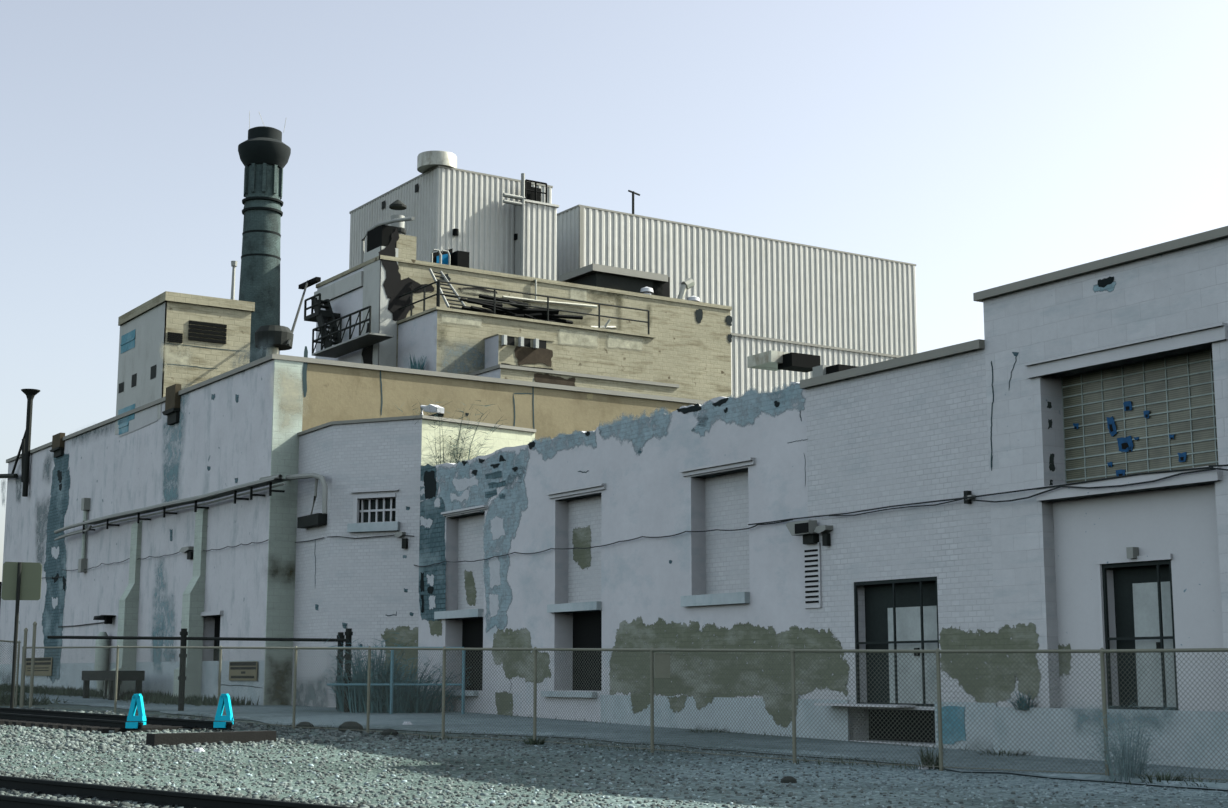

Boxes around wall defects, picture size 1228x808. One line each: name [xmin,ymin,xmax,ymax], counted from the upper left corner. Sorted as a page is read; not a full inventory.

spalling [403,383,805,633]